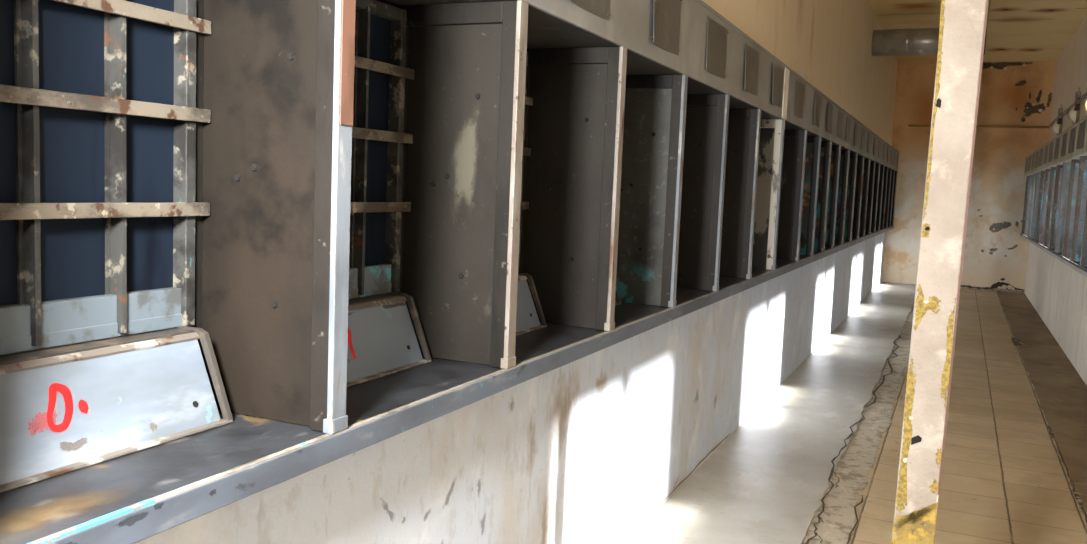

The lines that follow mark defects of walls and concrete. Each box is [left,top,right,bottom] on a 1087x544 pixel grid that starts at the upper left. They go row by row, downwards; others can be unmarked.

water stain [880,0,942,12]
peeling [982,62,1052,122]
water stain [522,357,612,544]
crack [806,335,901,544]
peeling [891,359,942,544]
peeling [914,285,956,409]